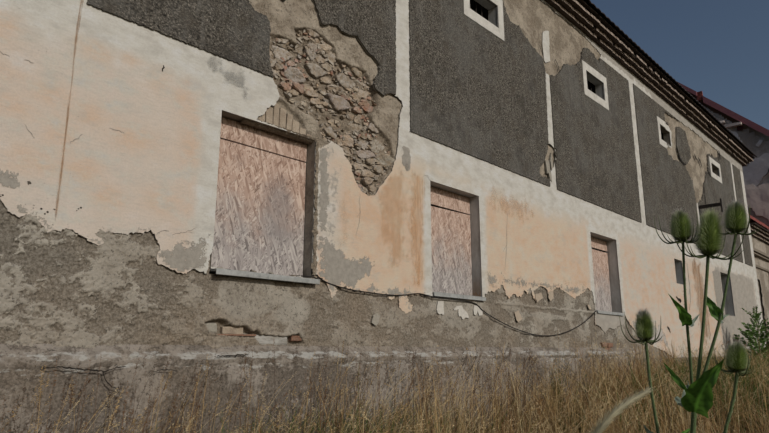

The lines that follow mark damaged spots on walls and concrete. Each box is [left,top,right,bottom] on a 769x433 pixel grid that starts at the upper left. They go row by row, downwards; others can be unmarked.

peeling [0,0,672,358]
leakage [317,146,412,300]
spalling [665,114,717,203]
peeling [742,140,769,220]
crack [43,366,126,388]